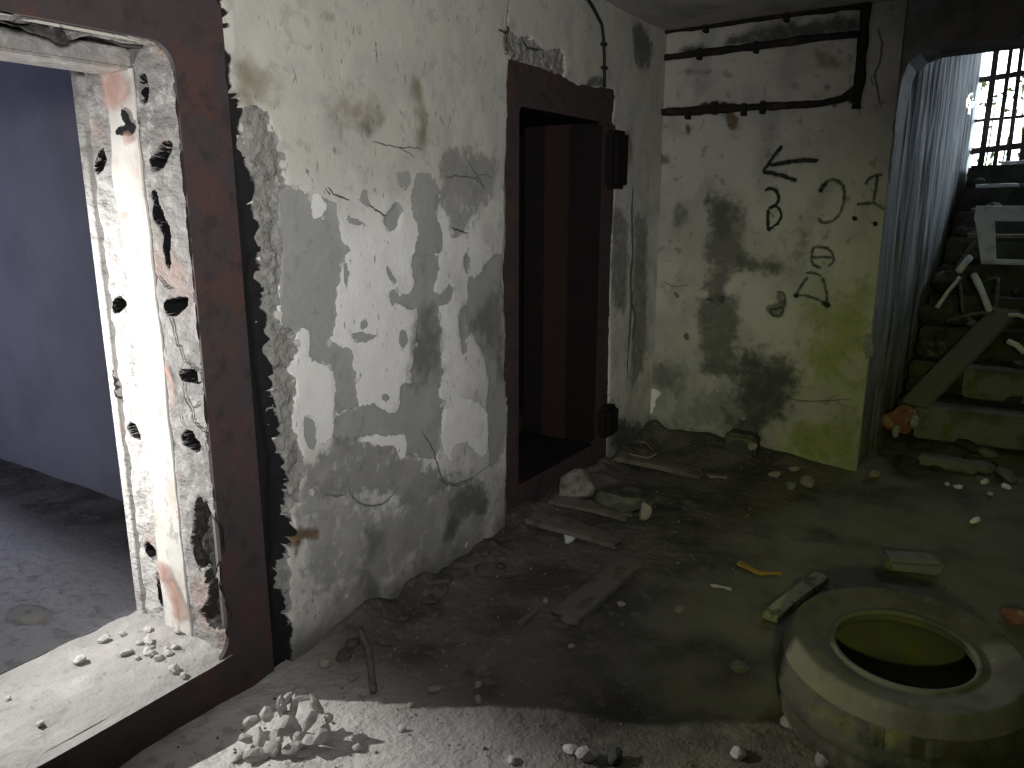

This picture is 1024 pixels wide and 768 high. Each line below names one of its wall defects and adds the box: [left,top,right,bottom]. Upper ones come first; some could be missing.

damp [634,24,652,67]
crack [374,141,423,157]
spalling [152,190,172,268]
spalling [112,295,127,314]
spalling [163,296,189,317]
peeling [236,105,508,522]
damp [612,212,672,385]
damp [699,197,796,433]
crack [169,314,208,453]
crack [324,484,398,509]
rust [285,529,318,553]
rust [158,563,187,618]